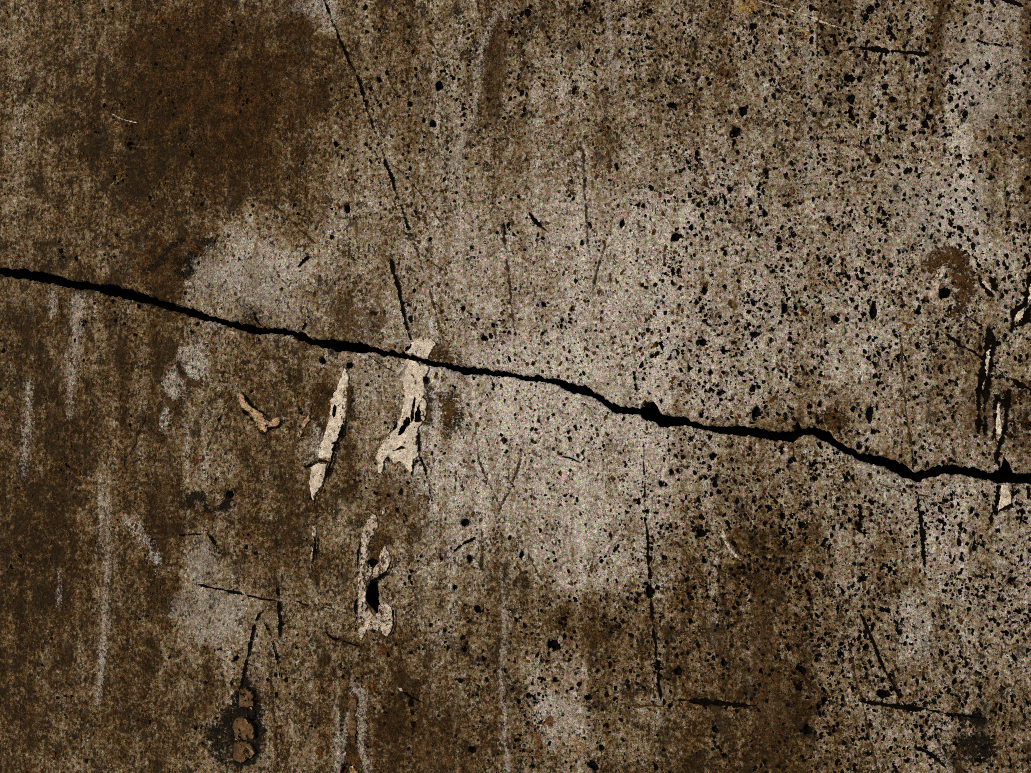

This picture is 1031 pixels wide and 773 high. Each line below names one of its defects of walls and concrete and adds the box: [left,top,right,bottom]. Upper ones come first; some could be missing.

leakage [279,0,343,23]
crack [323,0,424,273]
leakage [174,259,194,281]
leakage [19,381,35,475]
leakage [64,294,87,419]
peeling [296,363,355,504]
spalling [376,337,436,475]
crack [0,253,1031,702]
peeling [353,507,394,640]
spalling [205,677,266,770]